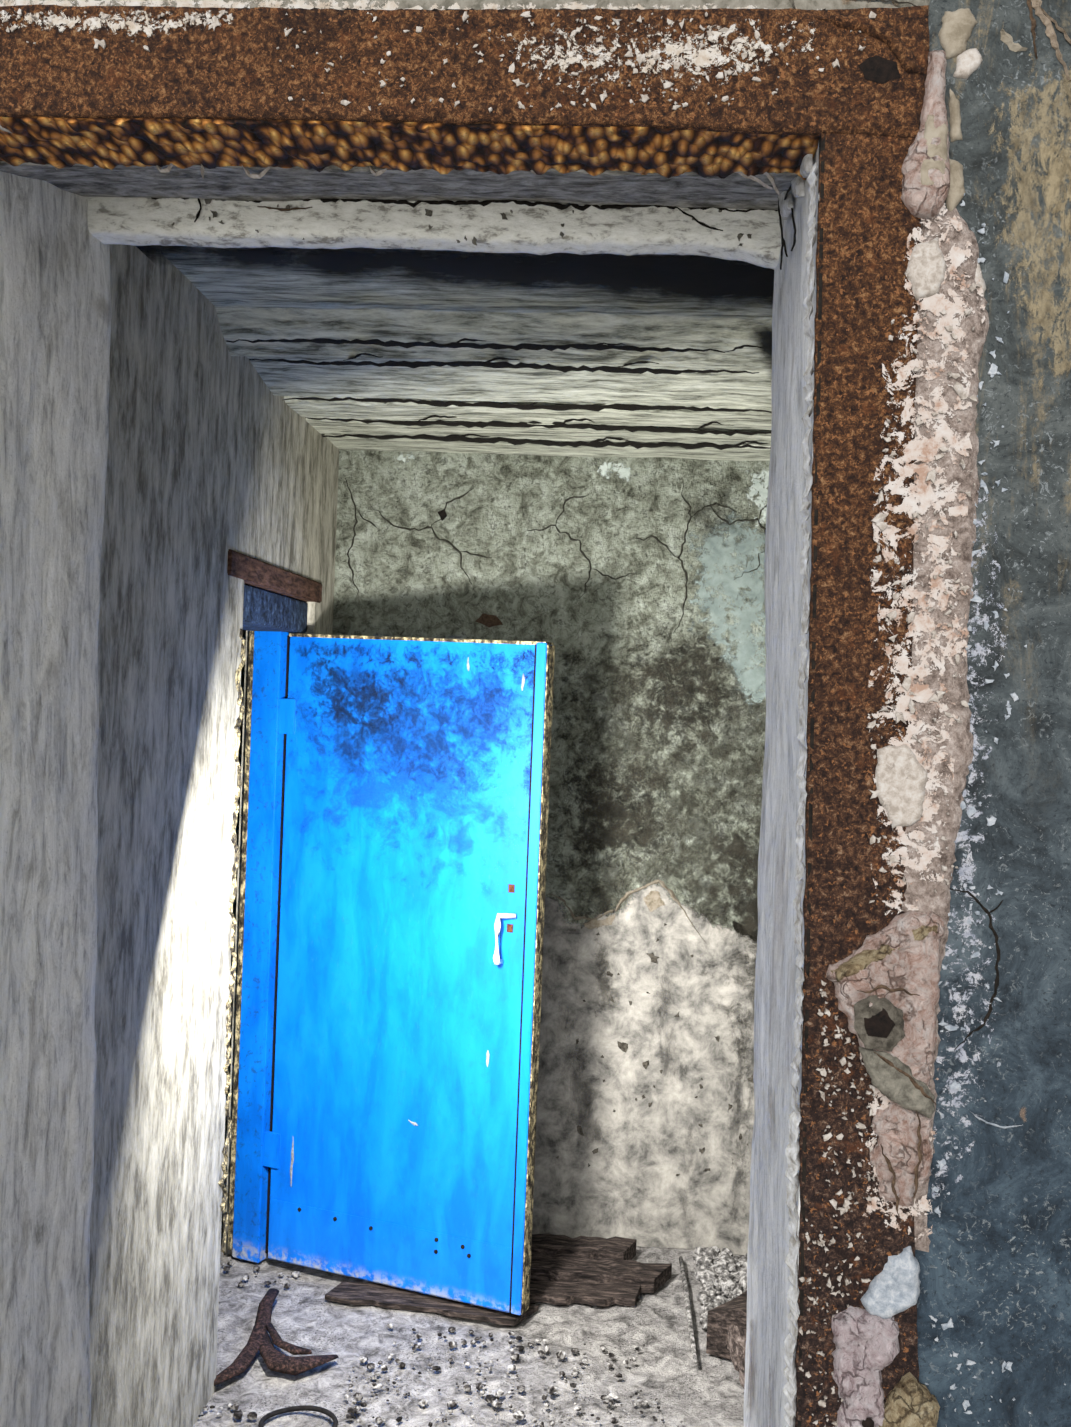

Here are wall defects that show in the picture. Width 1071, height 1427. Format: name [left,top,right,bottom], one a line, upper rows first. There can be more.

flaking render [0,0,930,111]
rust [816,15,924,74]
peeling [242,165,270,179]
damp [597,462,636,481]
flaking render [476,613,503,628]
peeling [866,54,1071,1252]
damp [558,470,769,1053]